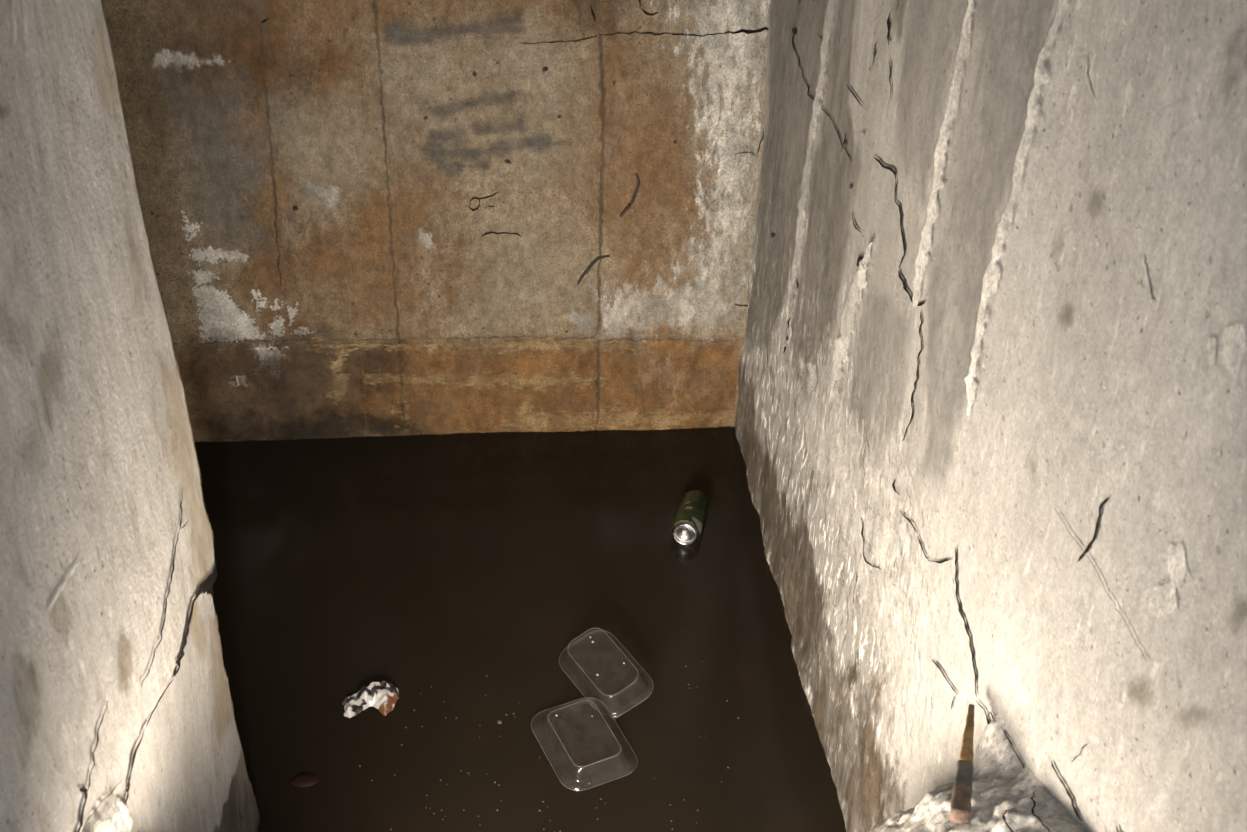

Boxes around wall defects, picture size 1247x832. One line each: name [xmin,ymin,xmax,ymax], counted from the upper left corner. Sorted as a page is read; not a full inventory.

leakage [153,49,223,67]
crack [520,0,925,442]
crack [77,488,207,832]
leakage [189,0,903,832]
crack [861,518,880,569]
crack [892,480,1087,821]